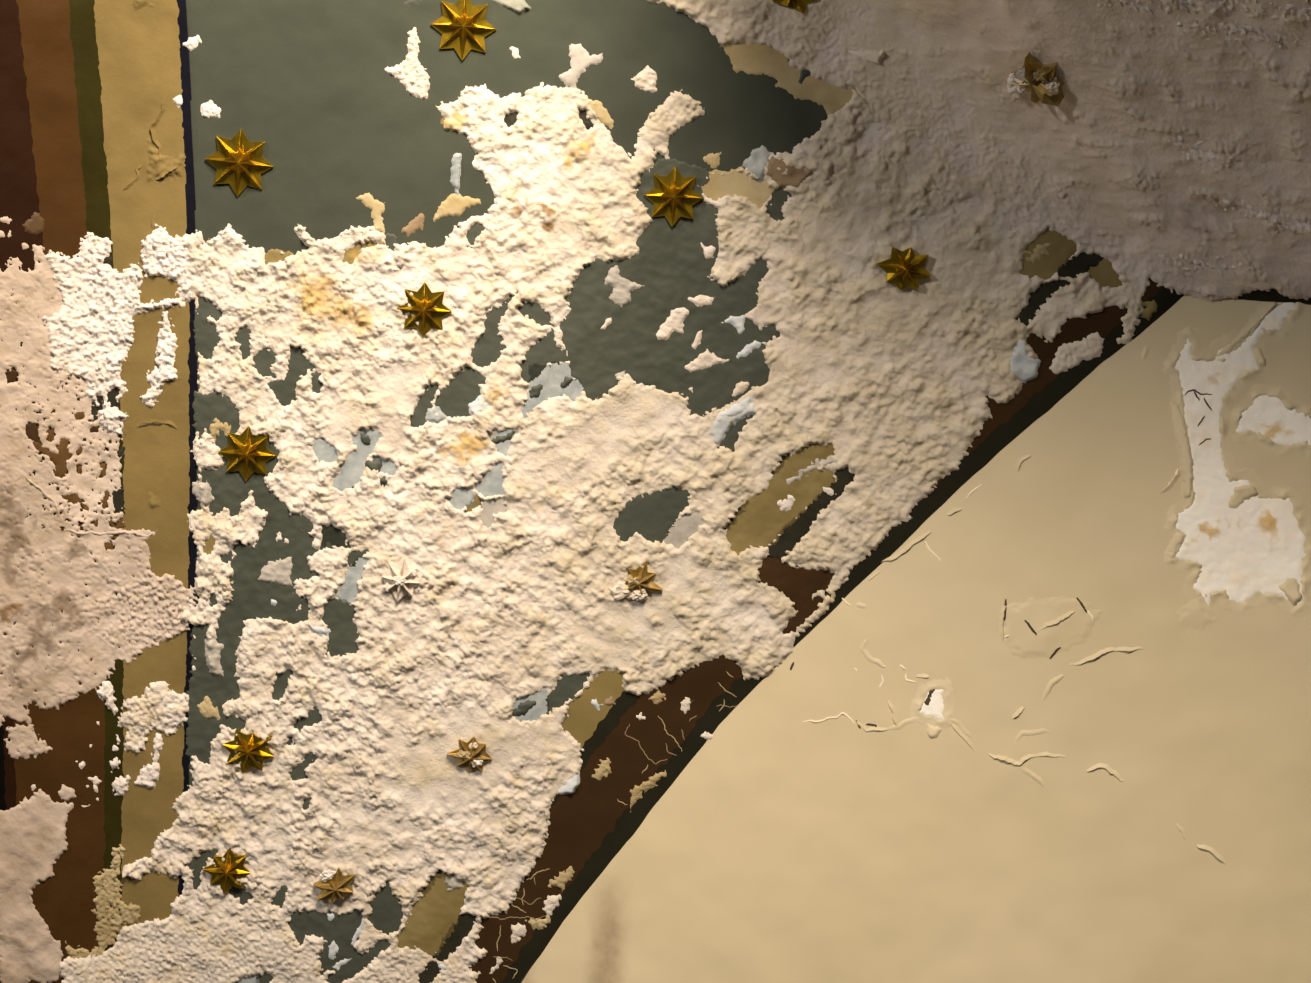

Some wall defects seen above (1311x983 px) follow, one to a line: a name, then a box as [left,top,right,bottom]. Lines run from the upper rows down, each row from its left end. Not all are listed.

peeling [492,0,531,14]
flaking render [384,27,430,99]
flaking render [0,216,12,238]
flaking render [22,212,45,235]
peeling [1140,300,1158,321]
flaking render [1162,302,1311,624]
flaking render [0,244,320,764]
flaking render [58,43,1147,983]
flaking render [0,789,74,983]